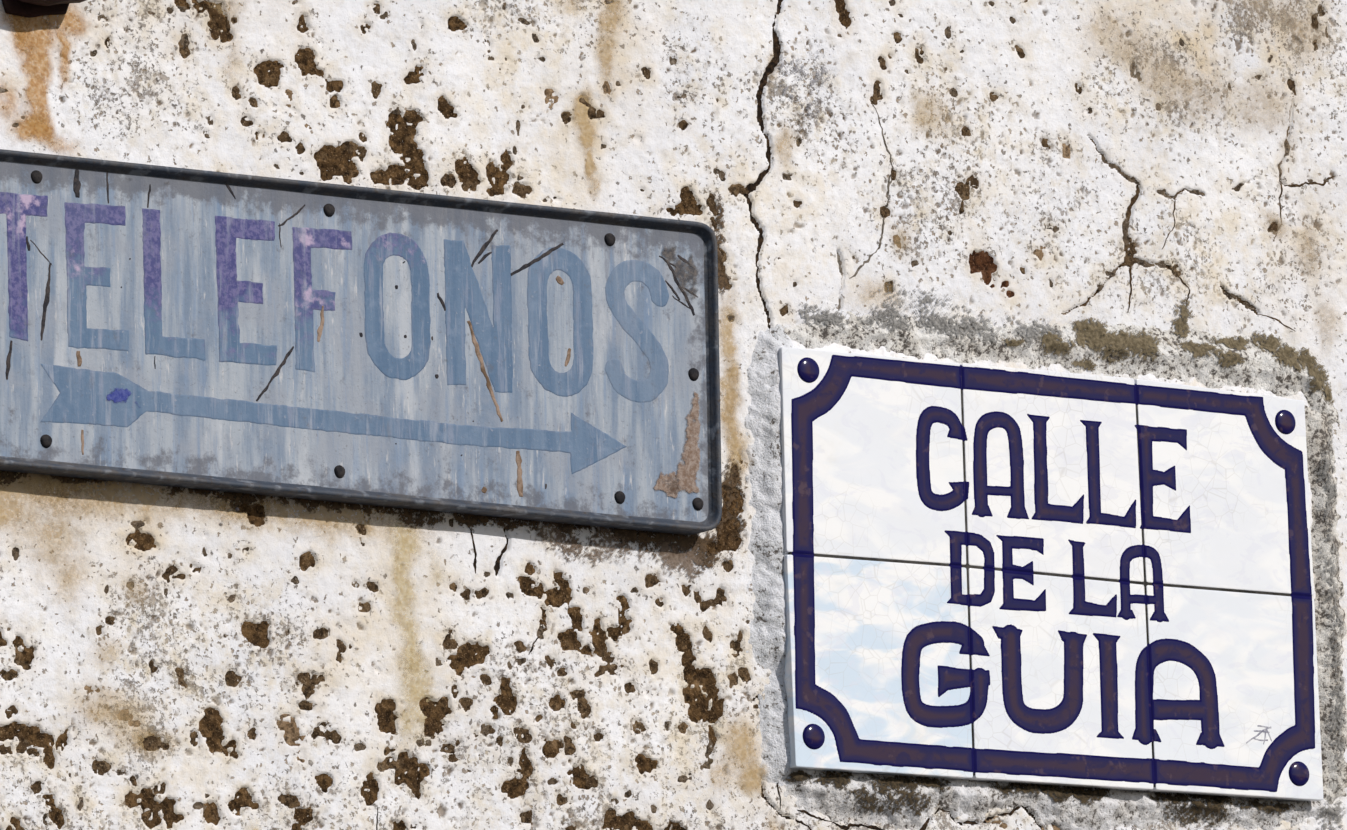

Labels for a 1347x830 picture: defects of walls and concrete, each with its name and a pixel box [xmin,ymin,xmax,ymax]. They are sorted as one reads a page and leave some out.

rust [3,8,83,141]
flaking render [231,0,556,202]
crack [744,0,783,339]
crack [1061,137,1295,331]
crack [1273,105,1334,242]
flaking render [0,627,35,681]
flaking render [92,759,259,829]
flaking render [190,707,256,759]
flaking render [276,672,366,763]
flaking render [361,563,664,825]
flaking render [603,790,686,830]
flaking render [664,585,758,783]